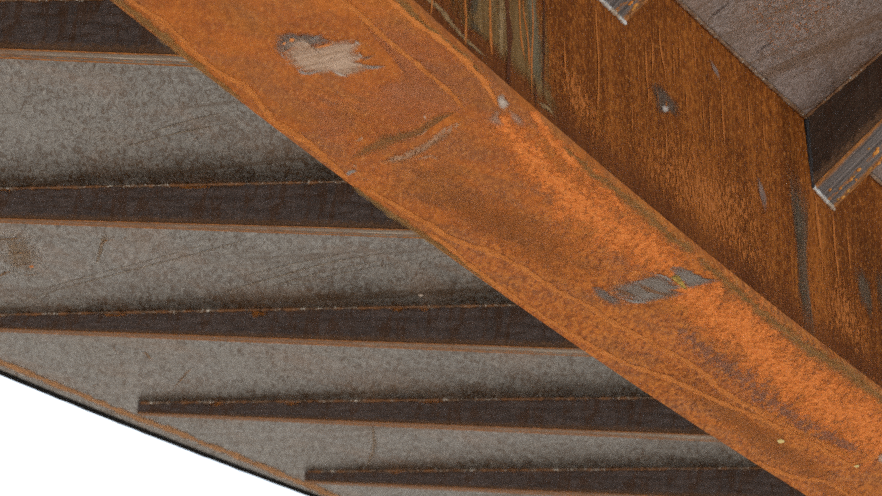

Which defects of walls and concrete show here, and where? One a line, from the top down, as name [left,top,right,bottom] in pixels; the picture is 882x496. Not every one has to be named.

rust [127,0,347,180]
peeling [278,35,378,76]
rust [340,0,463,107]
rust [388,0,498,105]
rust [505,0,534,95]
rust [552,8,601,136]
rust [366,83,882,472]
peeling [565,148,882,402]
rust [0,360,338,496]